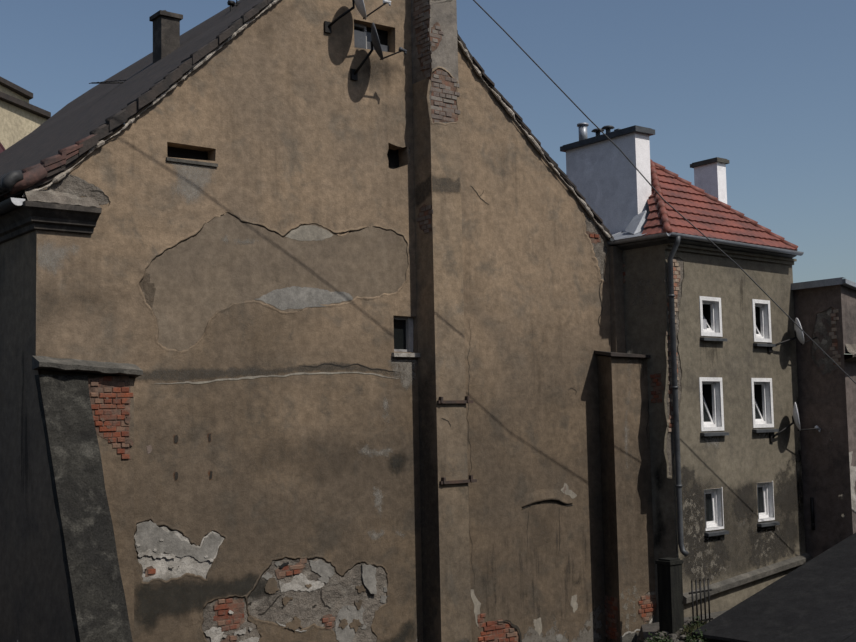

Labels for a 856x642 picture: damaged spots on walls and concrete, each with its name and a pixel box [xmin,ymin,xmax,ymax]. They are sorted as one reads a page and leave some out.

spalling [413,0,460,126]
spalling [136,210,410,354]
spalling [809,304,841,377]
flaking render [88,376,133,459]
peeling [134,516,228,586]
damp [682,467,729,582]
damp [732,450,801,566]
spalling [199,554,390,642]
spalling [471,586,656,642]